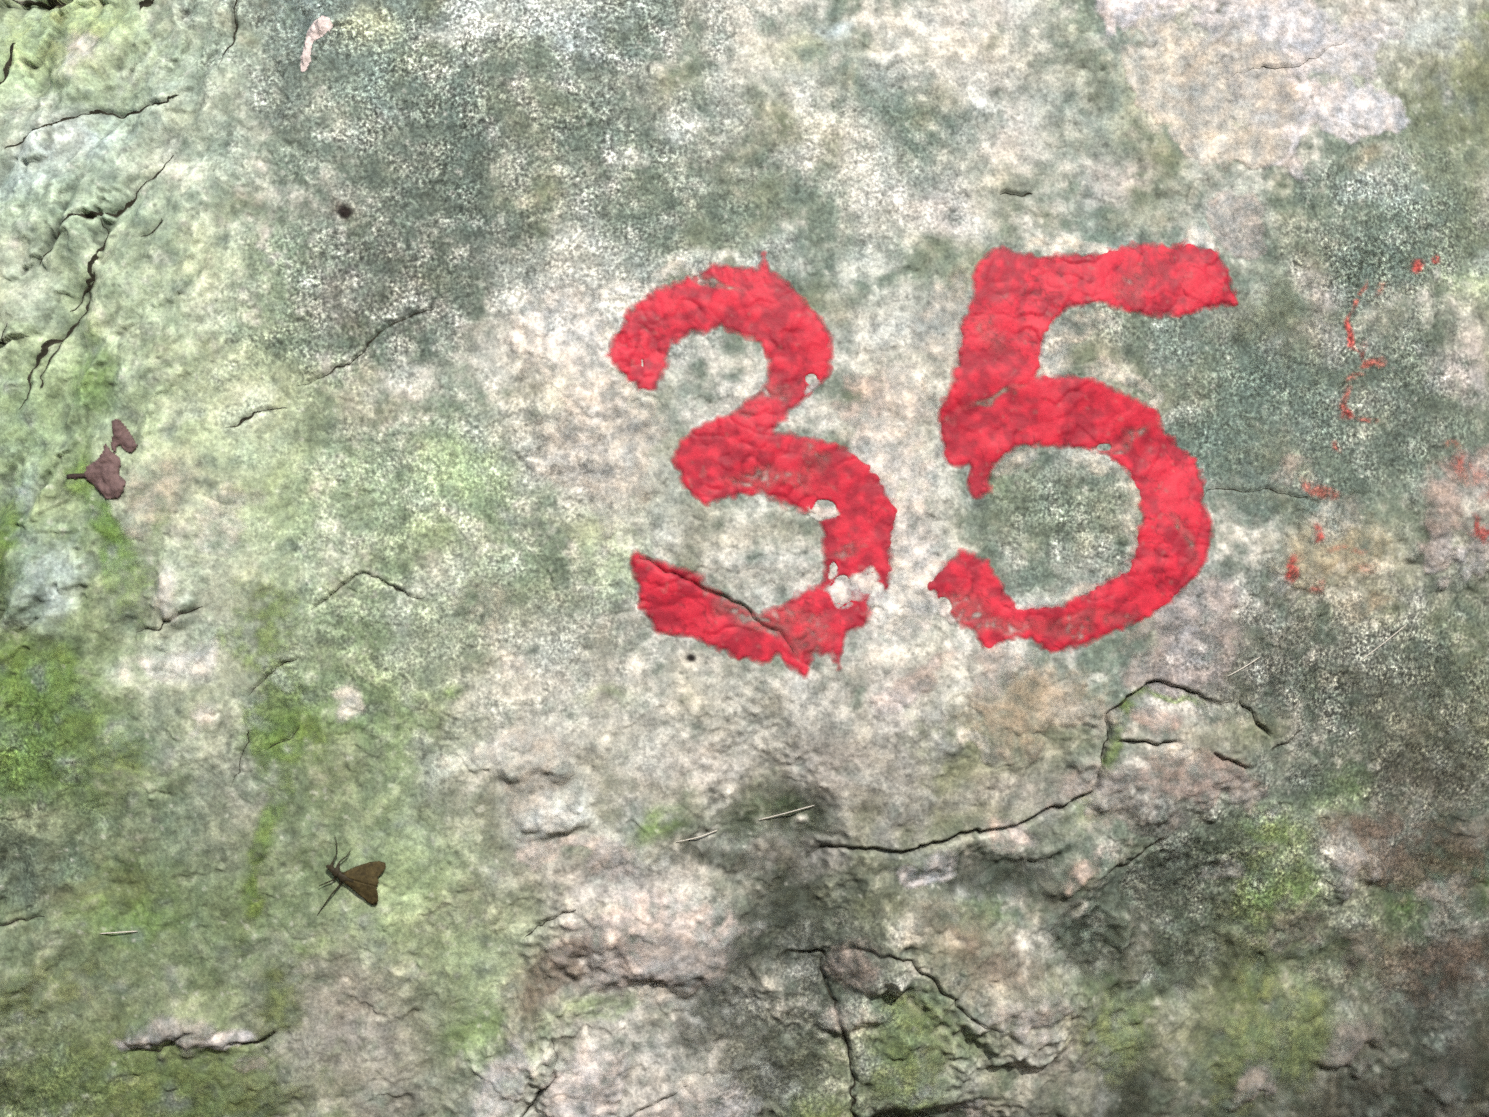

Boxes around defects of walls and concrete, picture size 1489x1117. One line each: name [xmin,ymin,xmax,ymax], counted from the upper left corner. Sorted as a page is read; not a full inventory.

crack [0,43,16,84]
crack [14,0,74,10]
crack [139,0,154,10]
crack [218,0,238,70]
crack [5,95,176,148]
spalling [1271,498,1361,591]
spalling [1420,447,1489,586]
crack [808,681,1303,856]